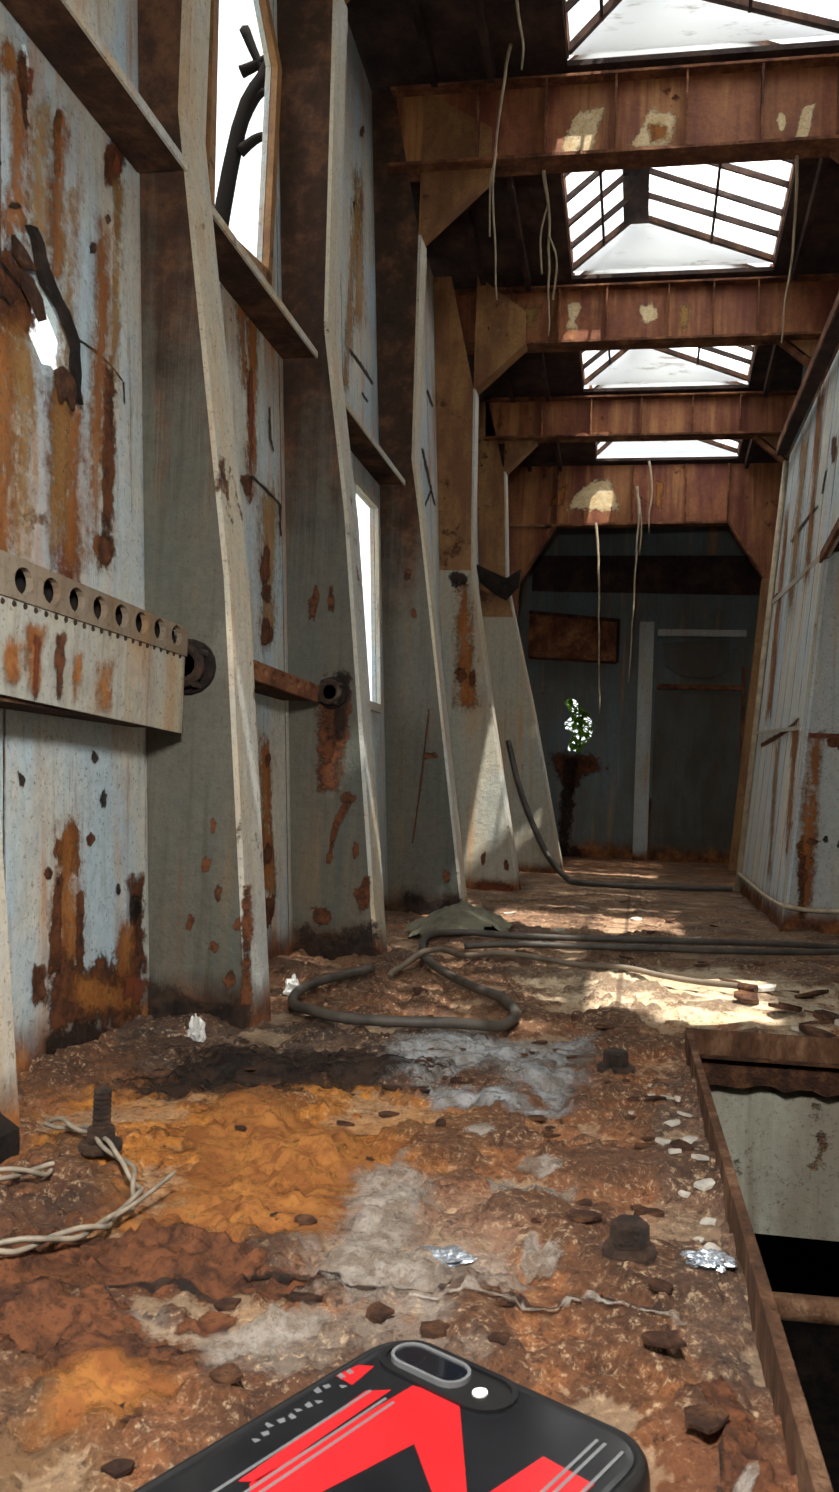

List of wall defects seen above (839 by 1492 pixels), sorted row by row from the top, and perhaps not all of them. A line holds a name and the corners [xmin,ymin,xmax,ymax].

peeling [563,107,604,152]
peeling [632,107,677,147]
peeling [776,104,815,137]
corrosion [0,38,123,582]
peeling [566,302,581,331]
peeling [639,302,658,324]
peeling [550,479,620,513]
corrosion [4,622,114,709]
corrosion [449,571,479,710]
corrosion [761,383,839,919]
corrosion [315,671,356,864]
corrosion [0,739,462,1452]